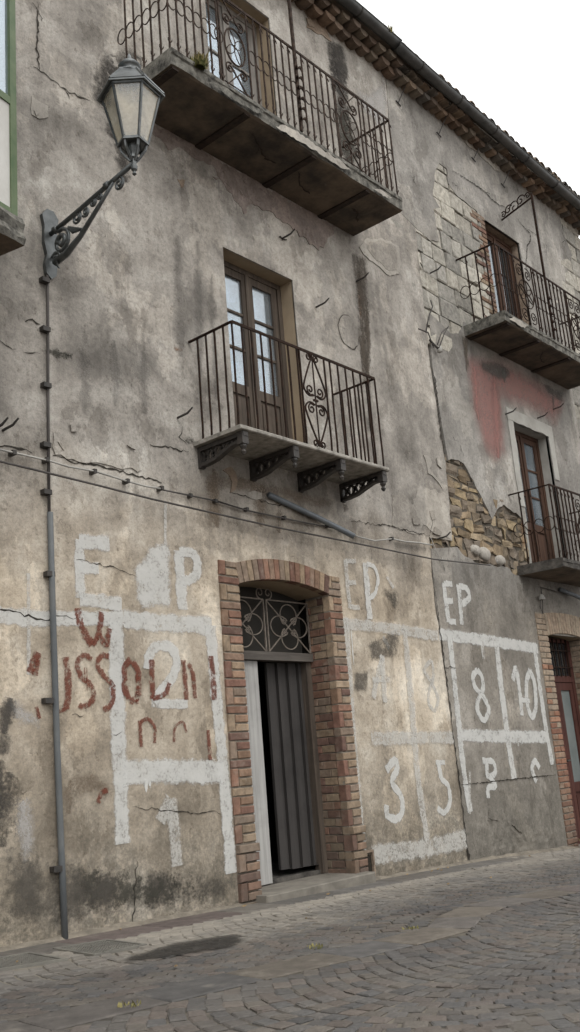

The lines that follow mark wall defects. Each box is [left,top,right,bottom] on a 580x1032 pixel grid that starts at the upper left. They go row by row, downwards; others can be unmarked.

leakage [328,41,351,111]
leakage [362,80,387,125]
spalling [392,454,530,575]